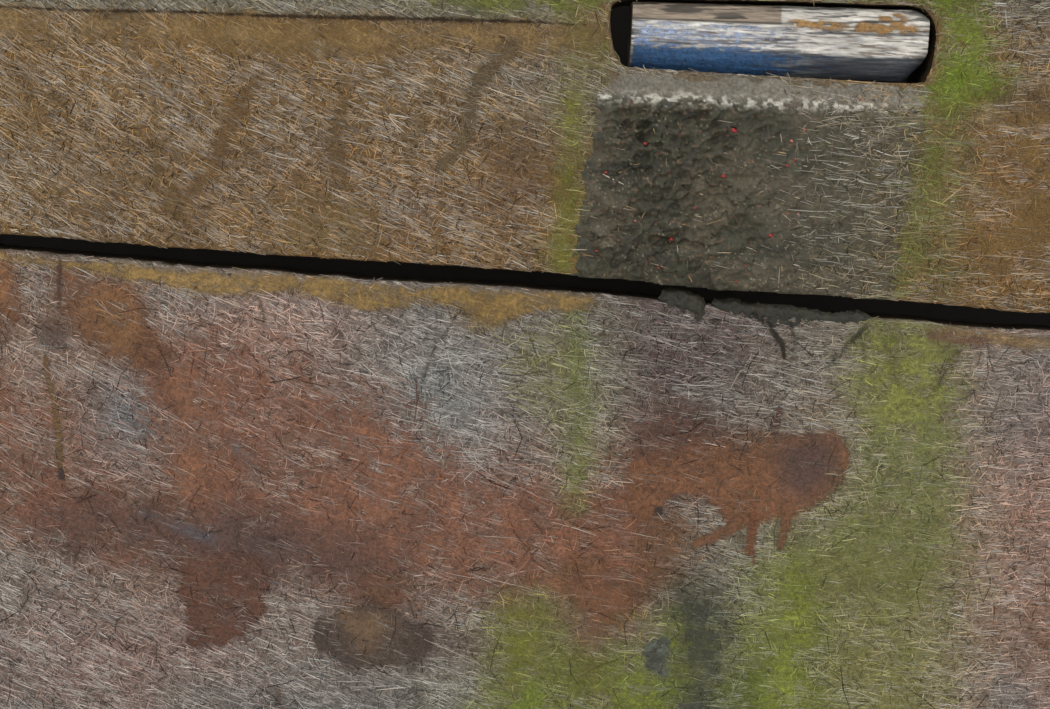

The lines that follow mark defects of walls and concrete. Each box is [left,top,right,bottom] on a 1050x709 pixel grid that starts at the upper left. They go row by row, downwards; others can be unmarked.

spalling [567,22,931,300]
corrosion [43,355,64,479]
corrosion [627,407,850,584]
corrosion [313,603,432,669]